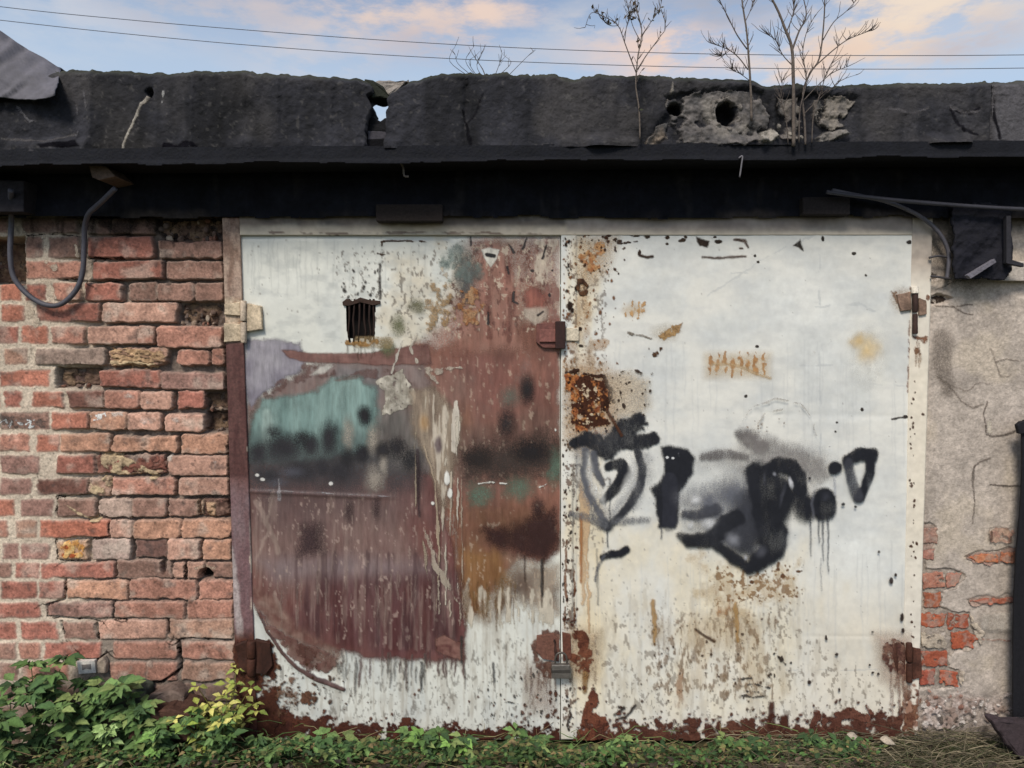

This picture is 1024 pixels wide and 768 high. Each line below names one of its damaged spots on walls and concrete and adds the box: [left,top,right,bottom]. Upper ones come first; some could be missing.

spalling [646,84,804,145]
spalling [812,95,855,142]
corrosion [562,235,646,457]
crack [944,382,1020,515]
corrosion [232,491,922,741]
flaking render [919,523,1015,734]